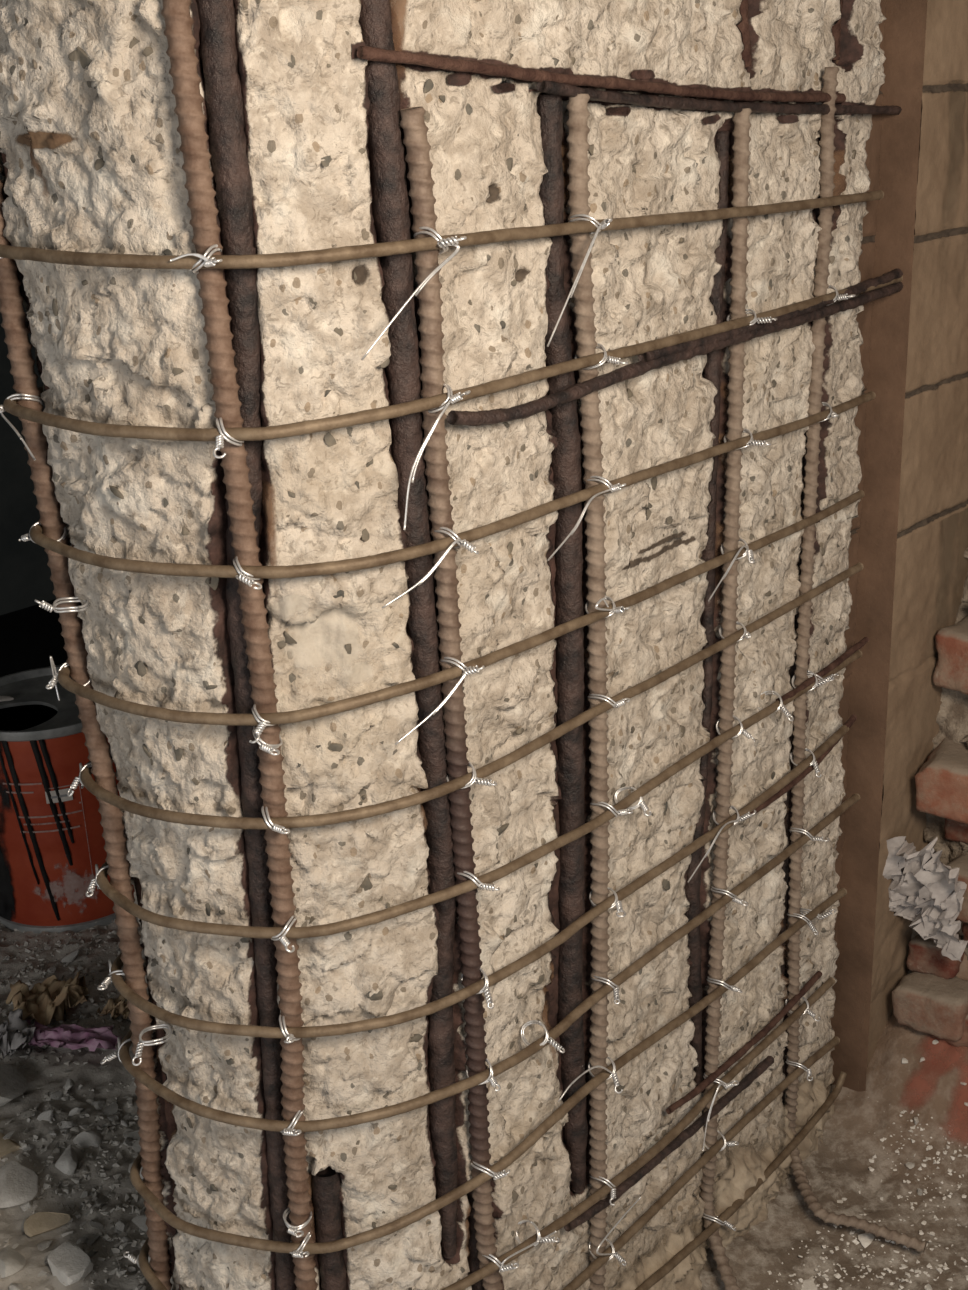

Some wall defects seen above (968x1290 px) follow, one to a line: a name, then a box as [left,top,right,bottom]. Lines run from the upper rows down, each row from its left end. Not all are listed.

spalling [0,167,183,1290]
rust [196,0,275,566]
spalling [129,0,372,1290]
rust [225,499,297,1290]
rust [307,1166,347,1290]
spalling [400,79,503,1290]
spalling [565,94,635,1290]
rust [357,0,903,1290]
spalling [700,342,757,1290]
spalling [729,108,752,321]
spalling [813,67,839,297]
spalling [774,317,927,1252]